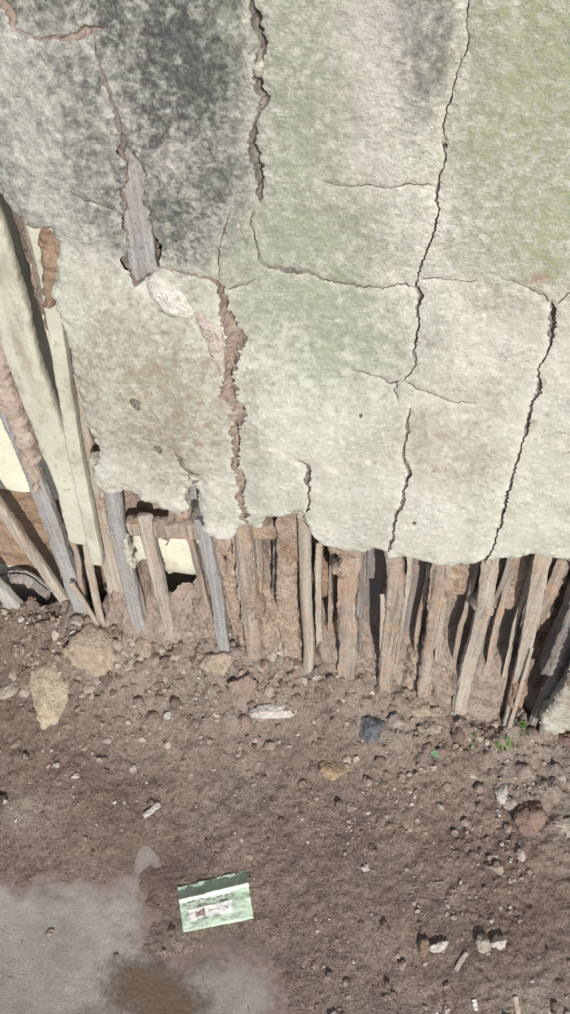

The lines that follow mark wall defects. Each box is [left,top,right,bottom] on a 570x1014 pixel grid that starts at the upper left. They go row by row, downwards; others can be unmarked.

crack [0,0,128,152]
crack [69,191,115,210]
spalling [38,227,60,309]
crack [158,0,474,553]
crack [484,278,570,563]
peeling [0,489,65,589]
peeling [55,499,108,601]
flaking render [171,474,210,536]
flaking render [539,660,570,724]